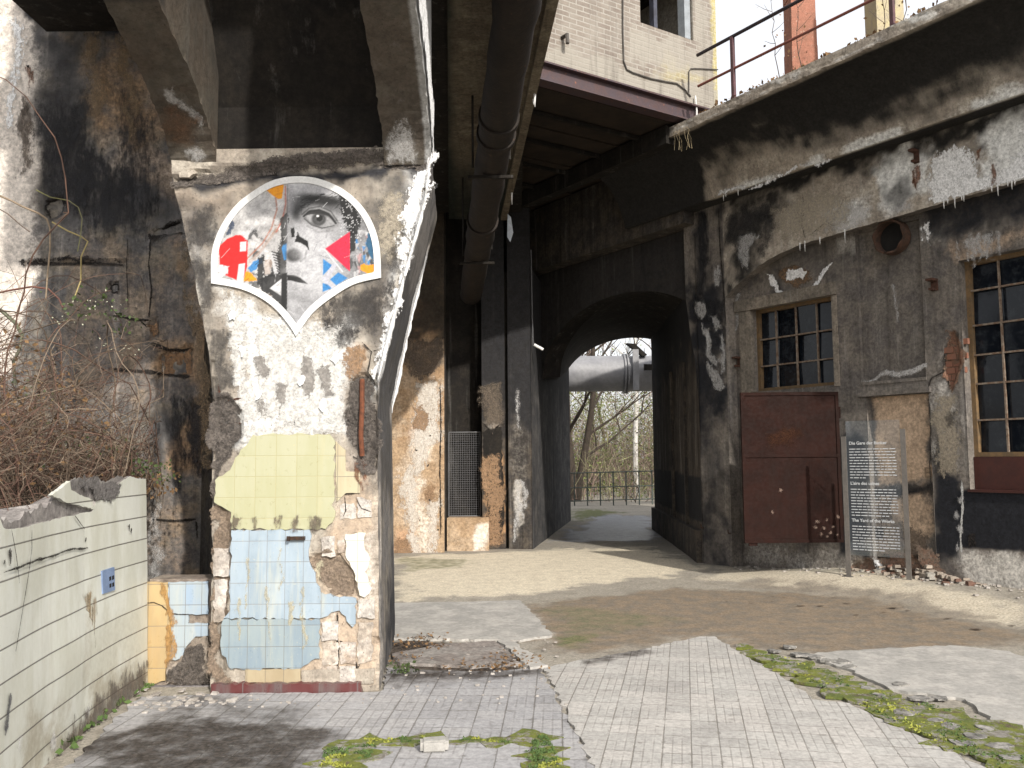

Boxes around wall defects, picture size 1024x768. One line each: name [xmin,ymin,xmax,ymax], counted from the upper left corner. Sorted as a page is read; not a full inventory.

leakage [4,17,159,236]
leakage [718,159,832,195]
leakage [926,144,1024,204]
flaking render [379,192,405,260]
flaking render [478,382,504,425]
flaking render [930,330,970,479]
spalling [74,474,121,503]
peeling [166,286,384,686]
peeling [394,380,445,553]
flaking render [480,453,507,546]